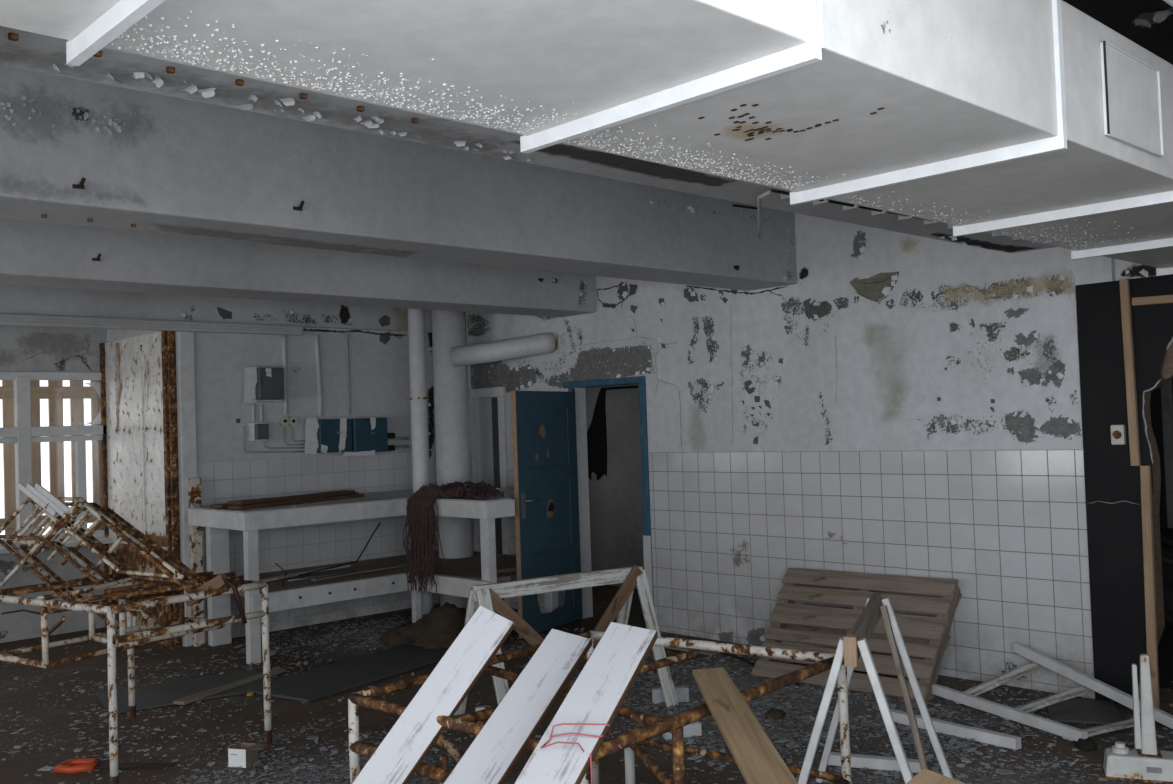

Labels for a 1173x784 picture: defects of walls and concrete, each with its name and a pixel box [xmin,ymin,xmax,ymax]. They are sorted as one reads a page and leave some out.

peeling [1131,8,1173,28]
peeling [183,79,216,99]
peeling [274,98,321,121]
peeling [353,116,423,141]
corrosion [714,104,839,141]
peeling [931,233,1035,252]
peeling [683,287,748,303]
peeling [467,280,666,398]
peeling [687,317,719,364]
peeling [780,272,1082,445]
peeling [688,377,724,415]
peeling [737,344,783,446]